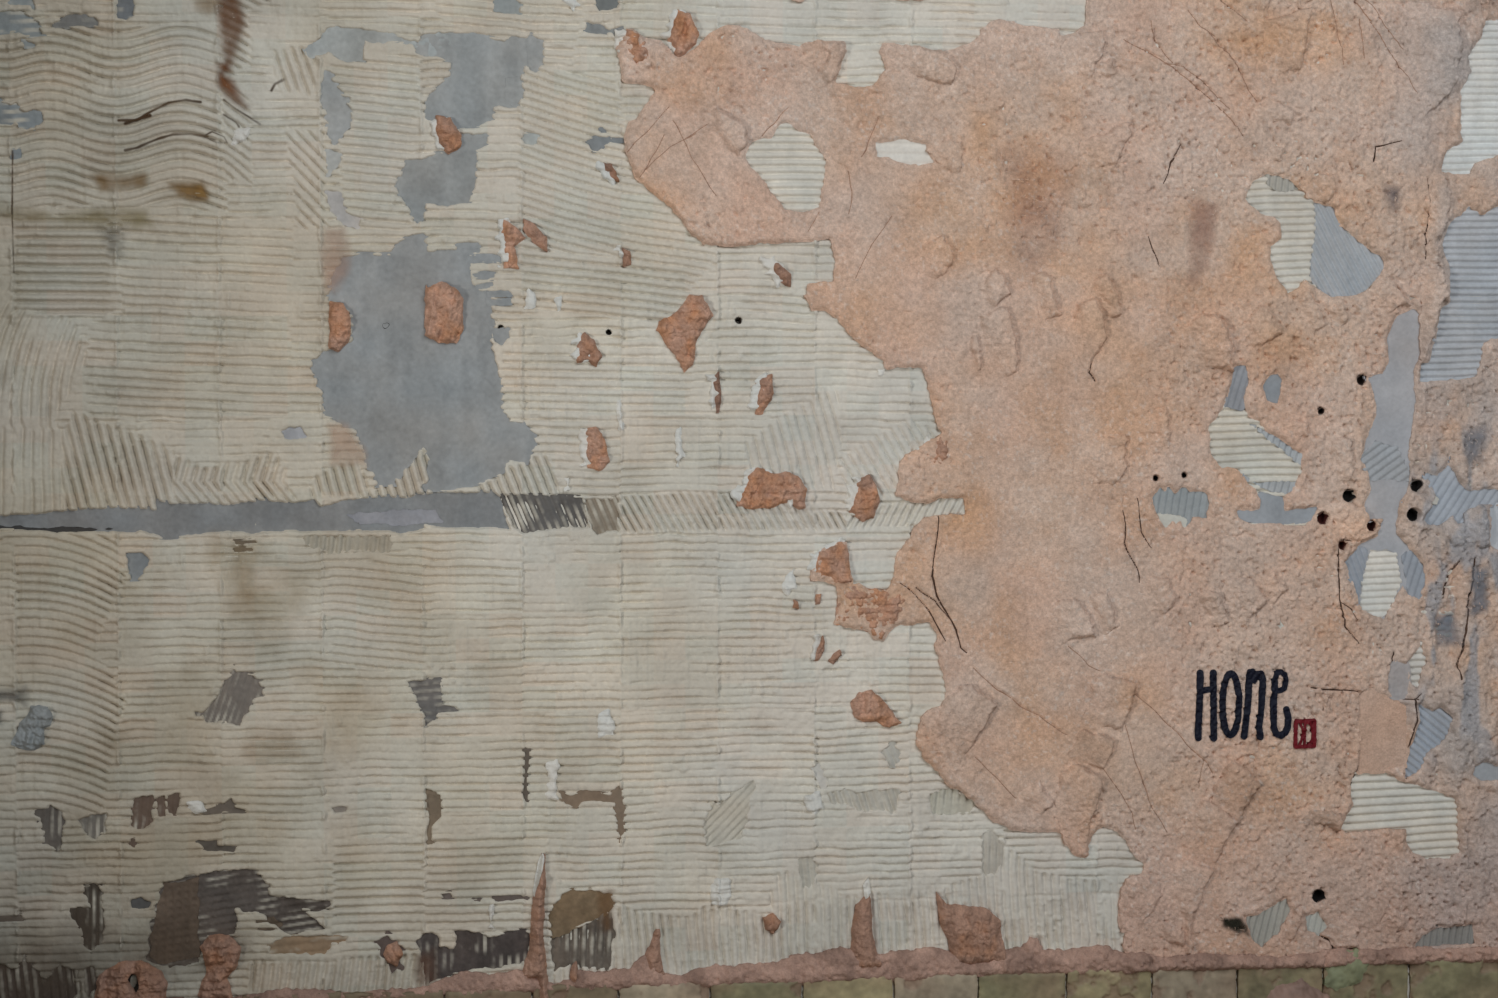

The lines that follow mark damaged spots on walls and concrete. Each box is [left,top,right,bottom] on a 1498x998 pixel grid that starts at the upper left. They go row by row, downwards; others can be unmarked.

spalling [1441,19,1498,174]
peeling [0,26,624,552]
spalling [1245,174,1384,297]
spalling [1208,365,1318,526]
spalling [1345,206,1498,619]
peeling [195,664,265,726]
peeling [408,677,458,728]
spalling [1341,641,1459,859]
peeling [128,793,181,848]
peeling [559,786,626,843]
peeling [70,883,105,953]
peeling [131,869,347,968]